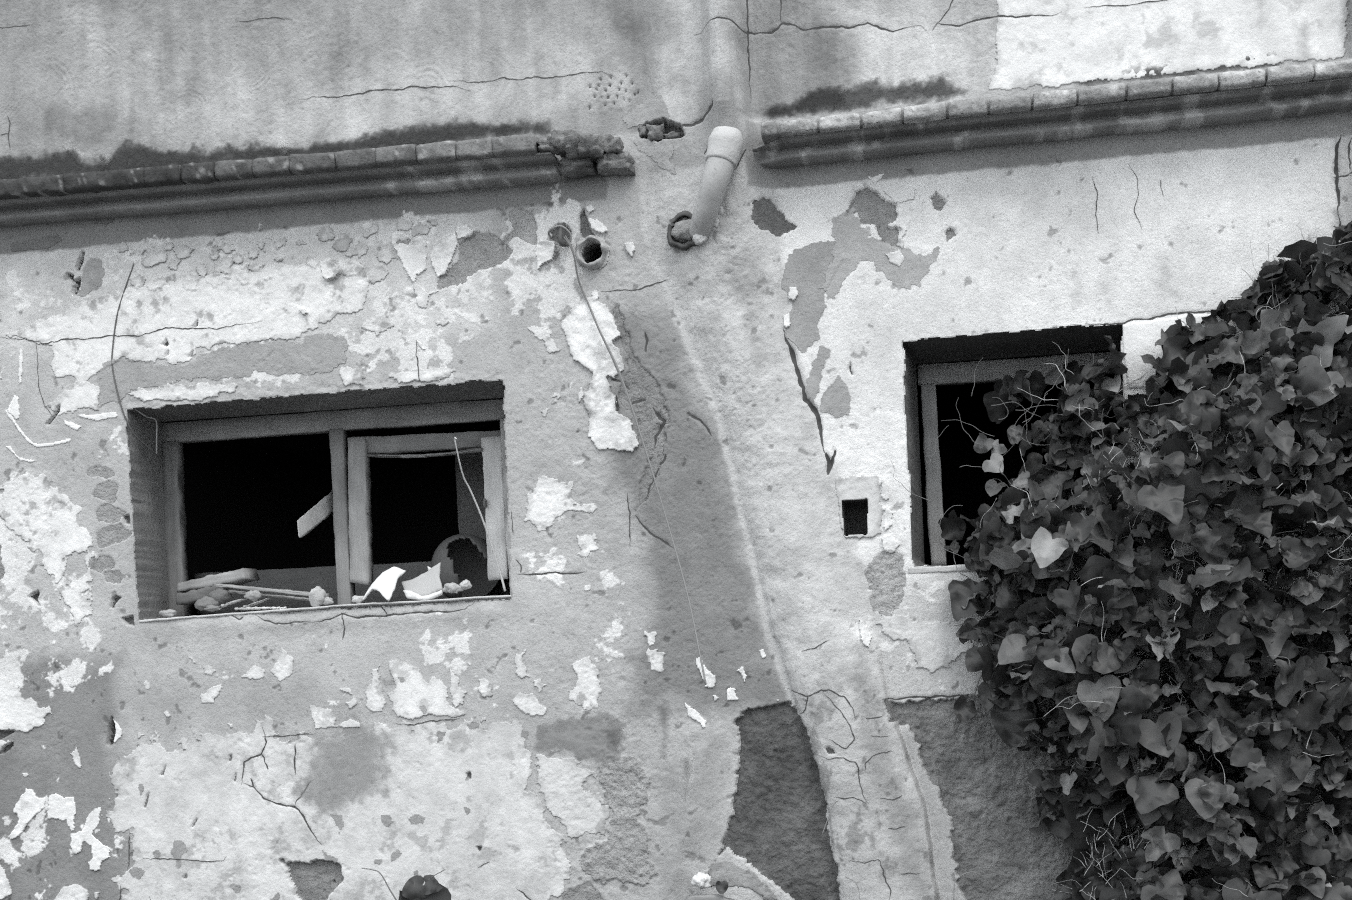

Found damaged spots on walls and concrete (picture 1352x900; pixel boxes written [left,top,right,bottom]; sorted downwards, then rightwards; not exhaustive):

crack [307,71,610,99]
crack [682,101,713,154]
crack [696,0,1163,94]
peeling [989,0,1349,90]
spalling [751,198,797,236]
peeling [5,205,635,424]
peeling [781,174,956,418]
peeling [528,290,670,504]
peeling [0,466,135,627]
peeling [524,475,597,532]
peeling [0,677,52,753]
peeling [9,648,657,900]